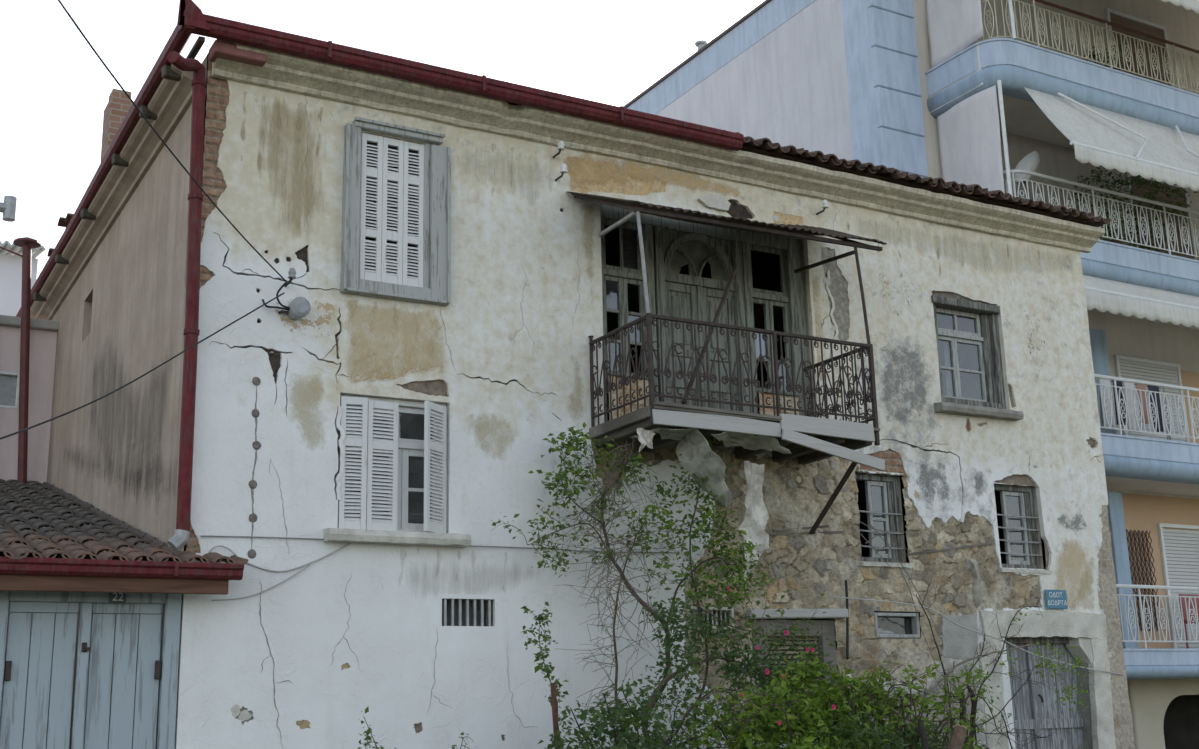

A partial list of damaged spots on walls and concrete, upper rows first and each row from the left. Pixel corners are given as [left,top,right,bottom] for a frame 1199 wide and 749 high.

flaking render [201,54,229,242]
damp [258,105,314,226]
flaking render [821,247,849,341]
crack [209,229,350,500]
flaking render [351,352,448,397]
crack [436,309,563,420]
damp [884,349,926,421]
flaking render [591,438,679,496]
crack [879,436,966,522]
crack [259,579,292,749]
crack [332,572,364,672]
flaking render [684,447,1049,714]